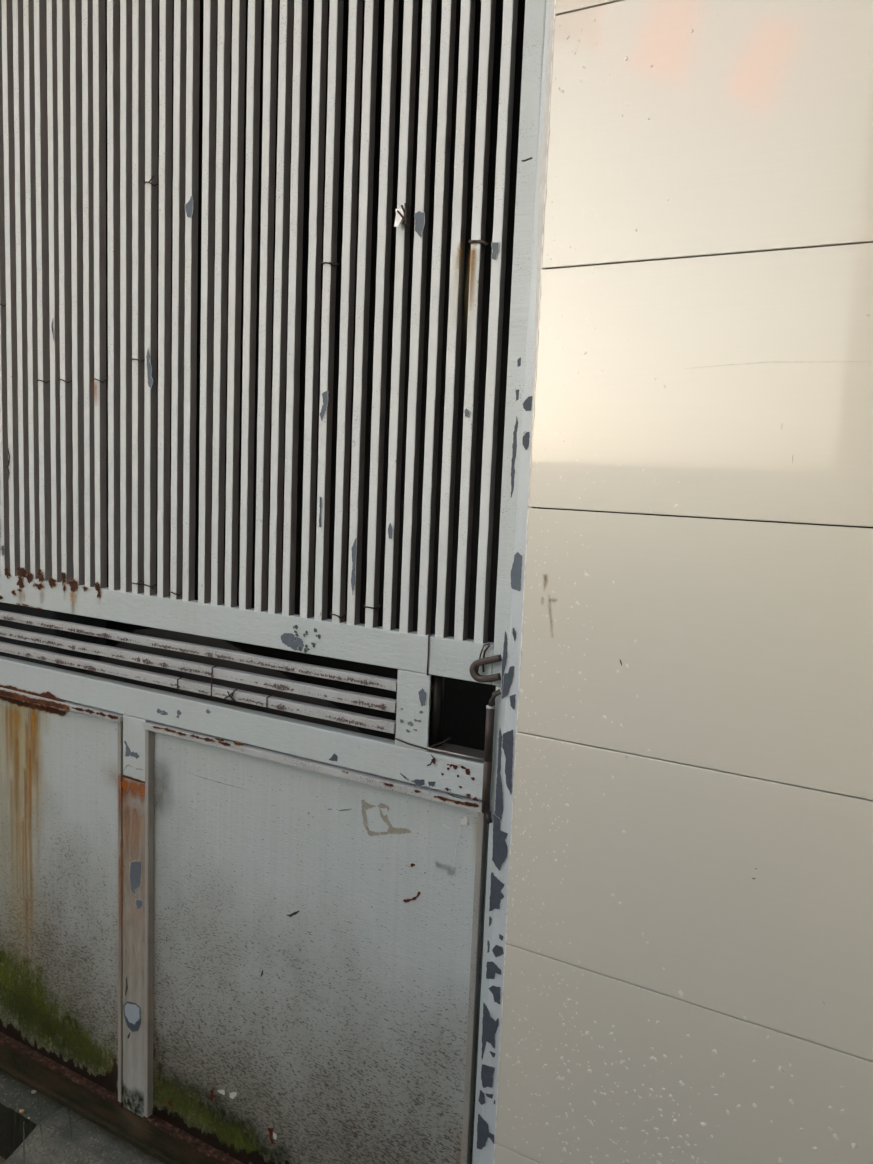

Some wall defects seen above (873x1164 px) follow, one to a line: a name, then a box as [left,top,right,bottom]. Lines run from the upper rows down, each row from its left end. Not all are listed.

corrosion [0,567,101,609]
peeling [280,625,321,653]
peeling [476,100,550,1164]
corrosion [0,685,118,849]
corrosion [118,775,158,810]
corrosion [431,758,479,807]
peeling [123,1001,141,1032]